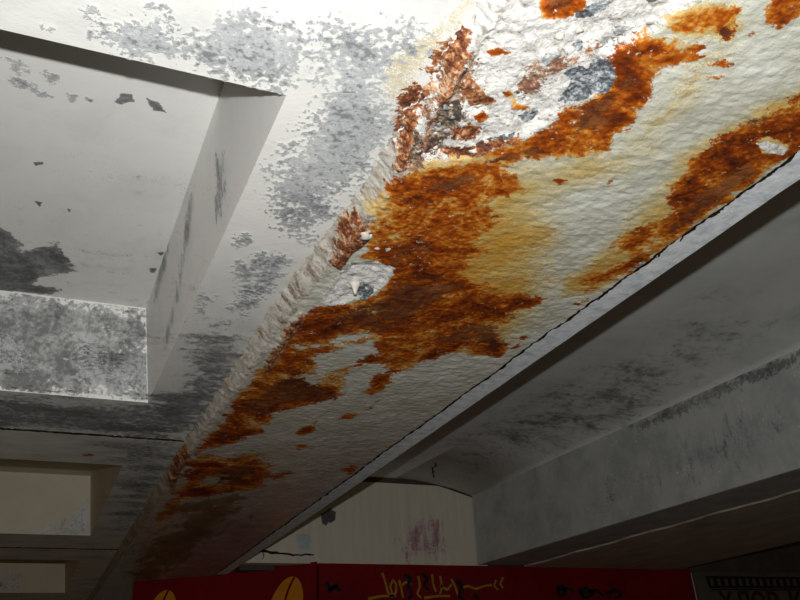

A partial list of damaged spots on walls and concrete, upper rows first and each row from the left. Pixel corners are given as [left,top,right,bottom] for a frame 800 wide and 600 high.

spalling [78,0,702,247]
water stain [377,0,477,113]
water stain [0,149,260,533]
peeling [225,233,296,317]
spalling [320,261,395,306]
spalling [359,230,391,252]
rust [154,0,800,523]
crack [215,152,797,575]
water stain [402,308,799,487]